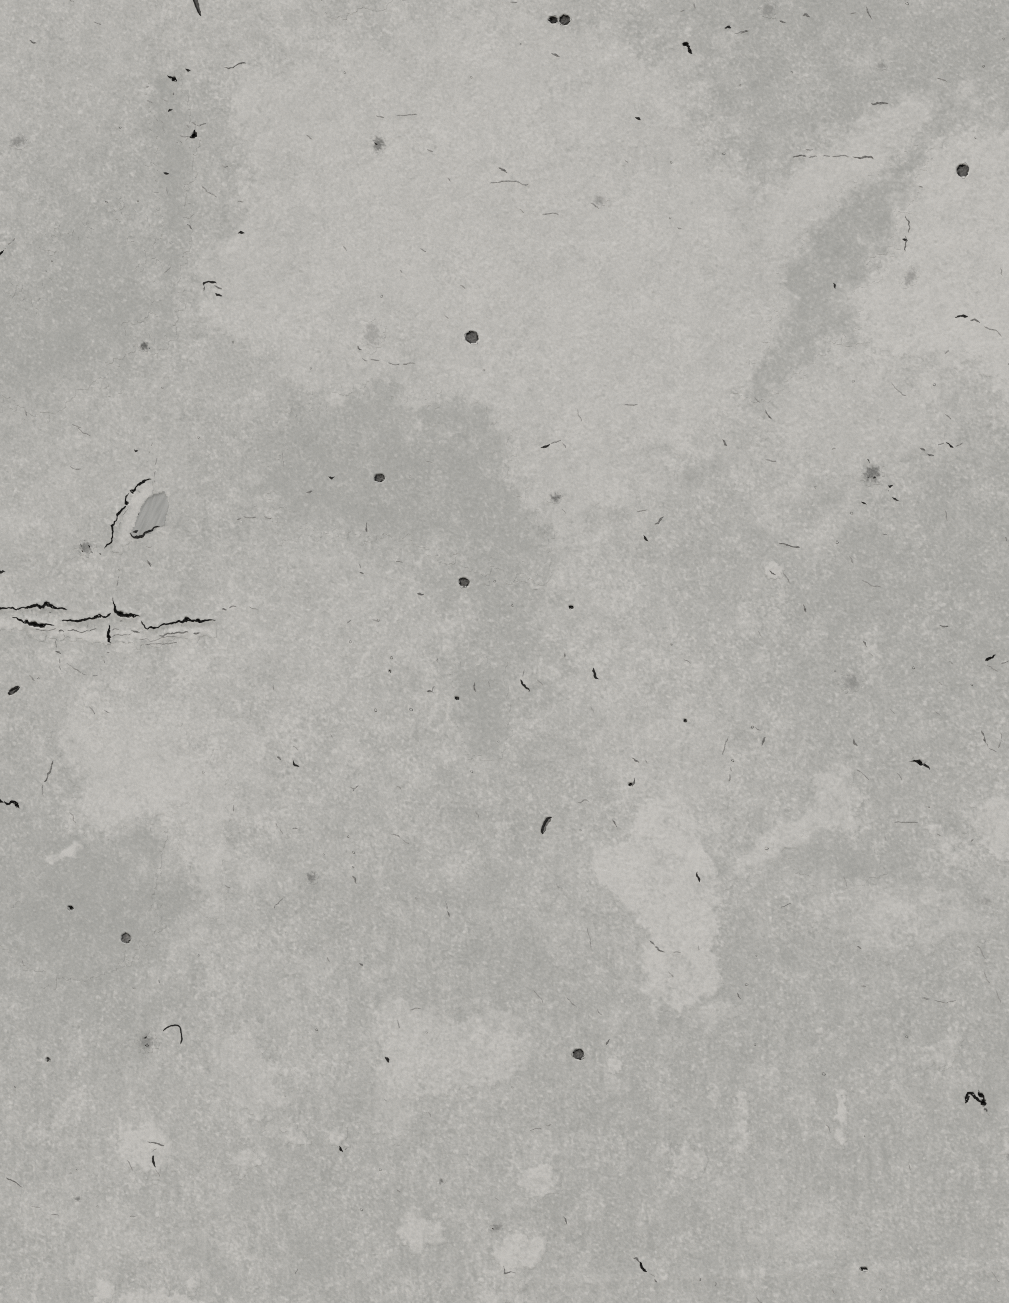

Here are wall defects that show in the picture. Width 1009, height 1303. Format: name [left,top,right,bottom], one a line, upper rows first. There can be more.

crack [0,449,256,681]
spalling [130,491,169,538]